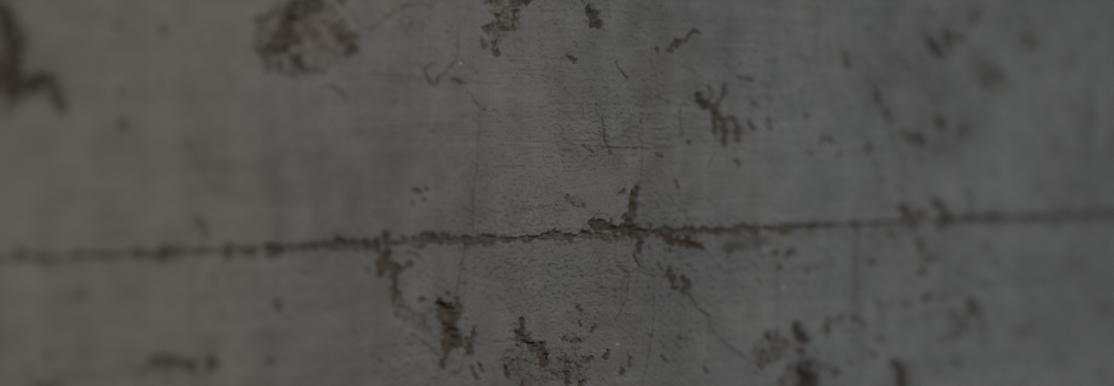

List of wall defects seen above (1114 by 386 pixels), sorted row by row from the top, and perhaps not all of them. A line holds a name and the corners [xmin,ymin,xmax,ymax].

spalling [244,0,366,83]
spalling [478,0,536,57]
spalling [688,75,774,168]
crack [769,240,811,330]
spalling [759,315,833,357]